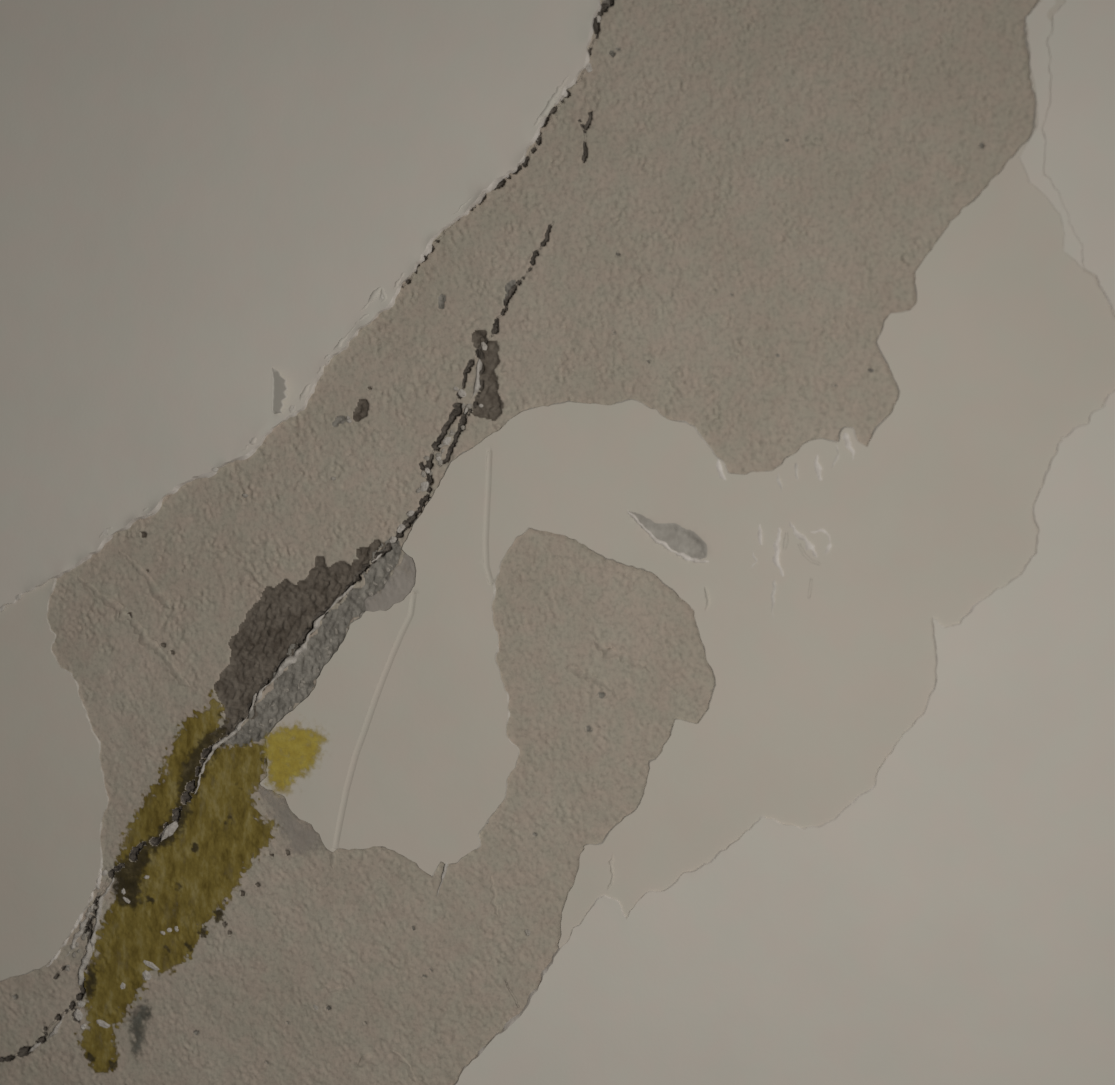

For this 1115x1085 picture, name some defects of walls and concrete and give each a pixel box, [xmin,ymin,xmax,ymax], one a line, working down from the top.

crack [401,0,614,288]
peeling [272,368,288,414]
crack [0,222,553,1062]
spalling [214,499,431,755]
peeling [627,390,1115,902]
water stain [74,690,326,1073]
spalling [583,793,644,847]